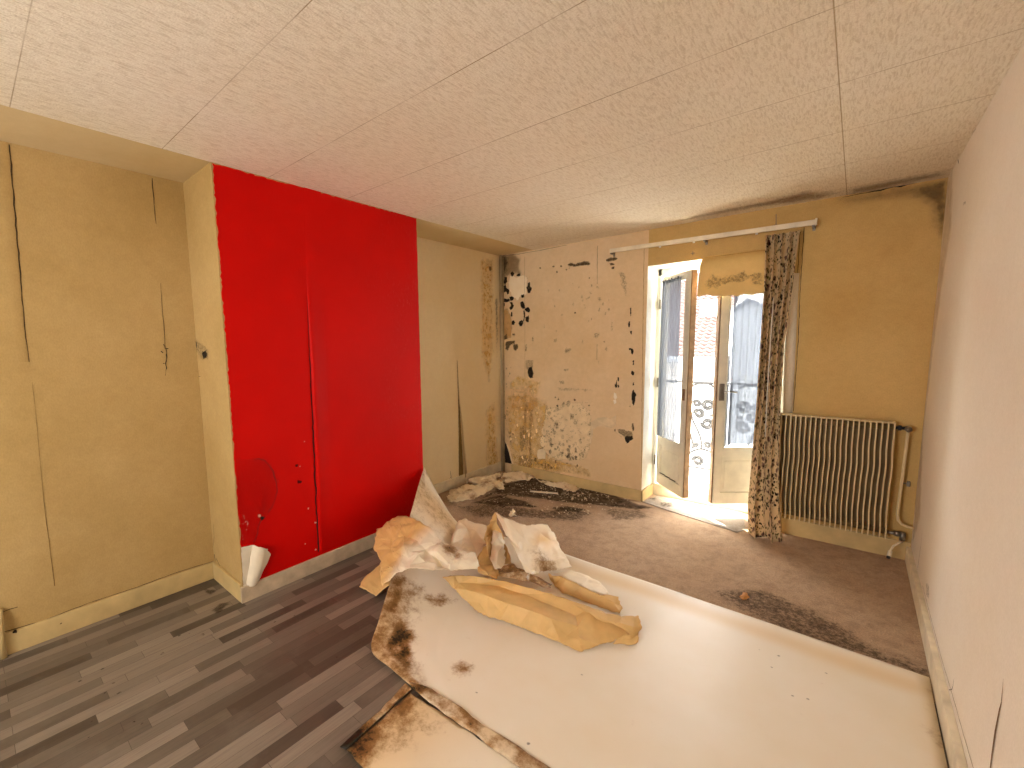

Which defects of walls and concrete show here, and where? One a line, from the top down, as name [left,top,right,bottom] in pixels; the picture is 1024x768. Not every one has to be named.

crack [0,143,55,586]
damp [458,406,650,520]